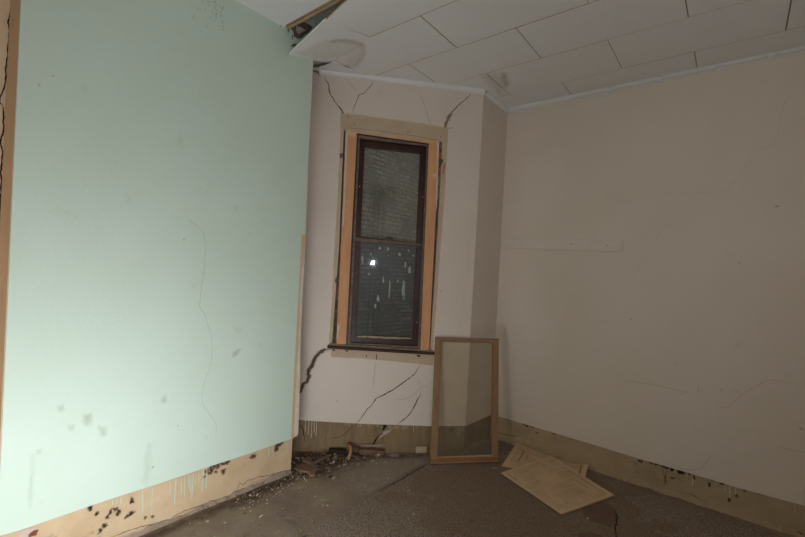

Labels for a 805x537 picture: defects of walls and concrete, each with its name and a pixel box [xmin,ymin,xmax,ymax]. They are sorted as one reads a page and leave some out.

flaking render [280,22,312,47]
crack [0,12,10,210]
crack [319,74,374,113]
crack [420,93,471,129]
crack [300,348,330,394]
crack [331,364,429,439]
leakage [88,498,135,534]